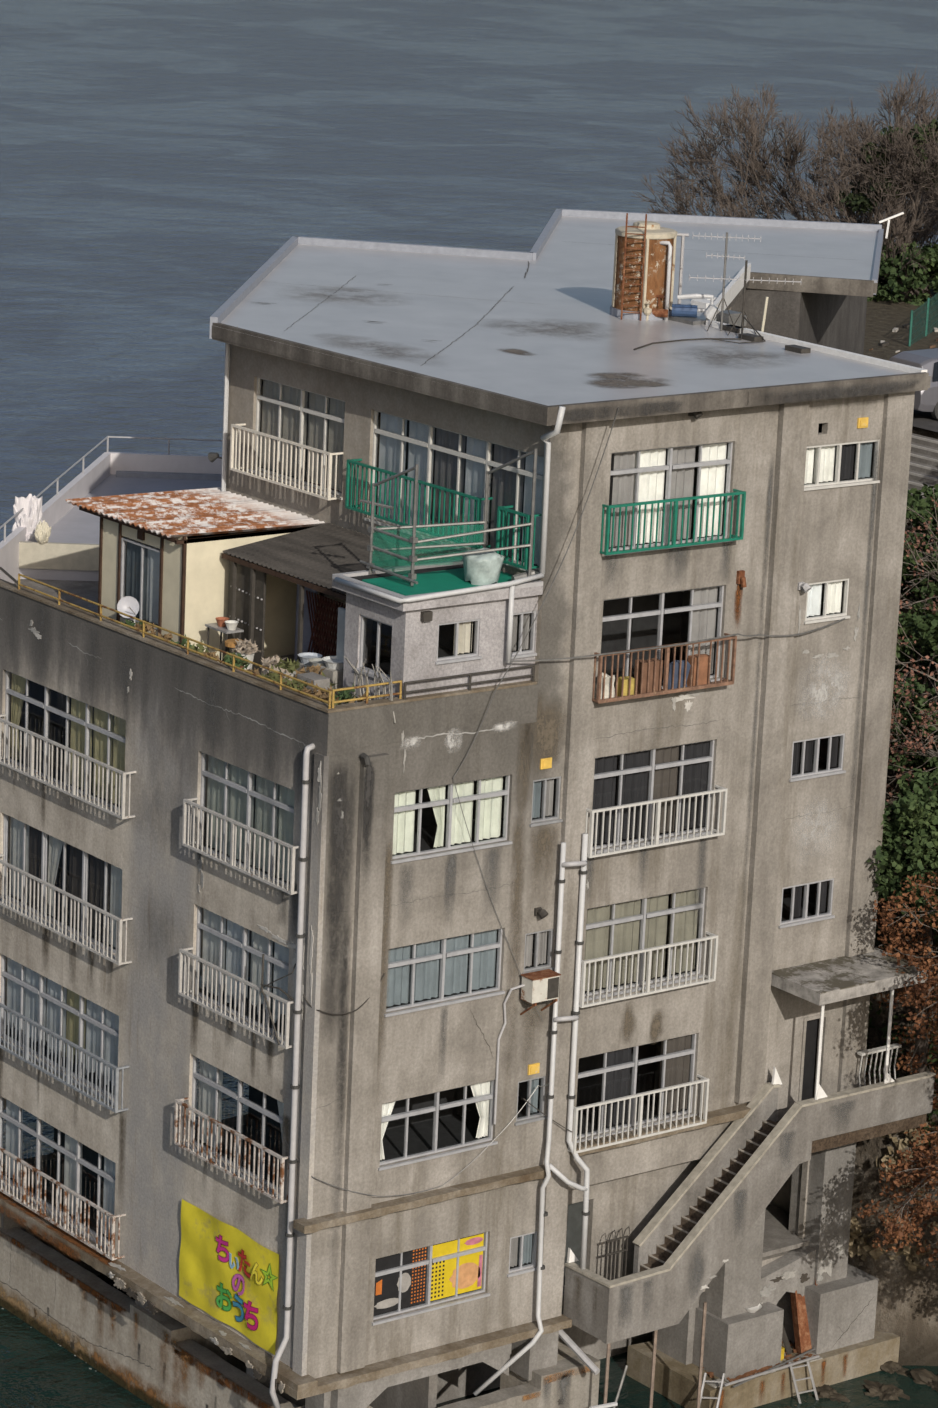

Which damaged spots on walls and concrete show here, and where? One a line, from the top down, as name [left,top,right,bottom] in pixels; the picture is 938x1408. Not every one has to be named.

leakage [282,884,298,925]
corrosion [0,1191,137,1329]
corrosion [0,1286,185,1408]
corrosion [164,1332,272,1408]